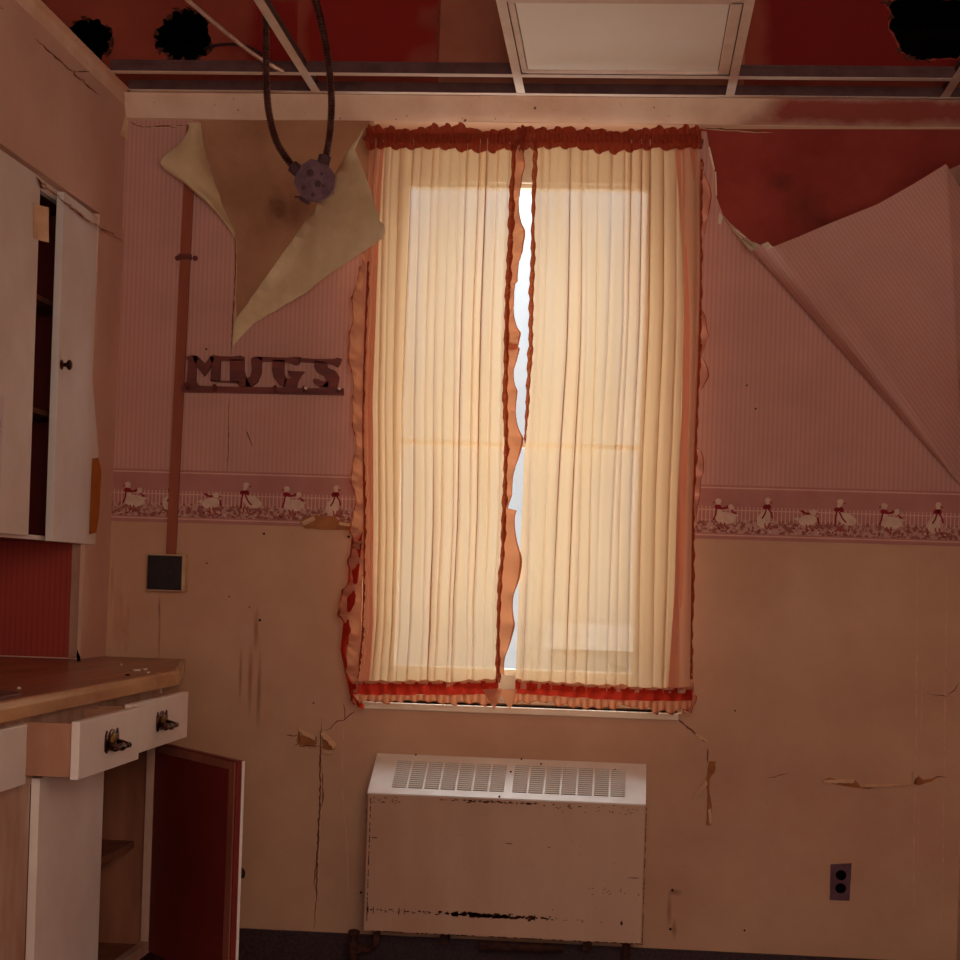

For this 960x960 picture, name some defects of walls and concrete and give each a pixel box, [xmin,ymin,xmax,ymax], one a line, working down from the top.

hole [70,16,115,62]
hole [153,6,214,60]
hole [881,0,960,63]
flaking render [193,120,370,317]
flaking render [702,129,960,246]
crack [314,703,354,927]